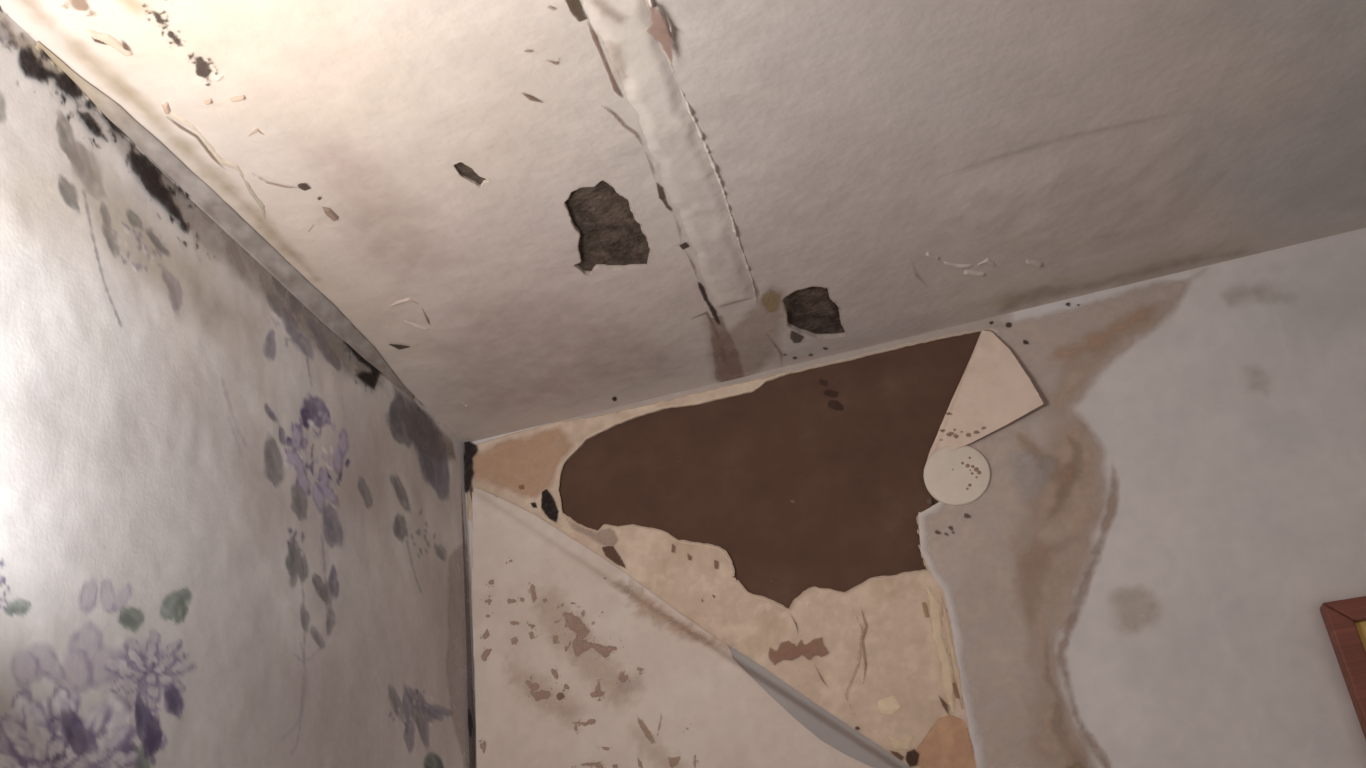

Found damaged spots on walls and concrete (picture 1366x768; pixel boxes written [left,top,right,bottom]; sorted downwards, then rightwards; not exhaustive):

flaking render [71,0,134,56]
flaking render [143,5,224,105]
leakage [0,6,380,389]
flaking render [563,180,652,276]
leakage [699,283,827,382]
flaking render [781,286,847,343]
flaking render [475,329,994,655]
leakage [926,282,1185,768]
leakage [620,584,714,643]
leakage [638,719,661,743]
leakage [891,749,919,766]